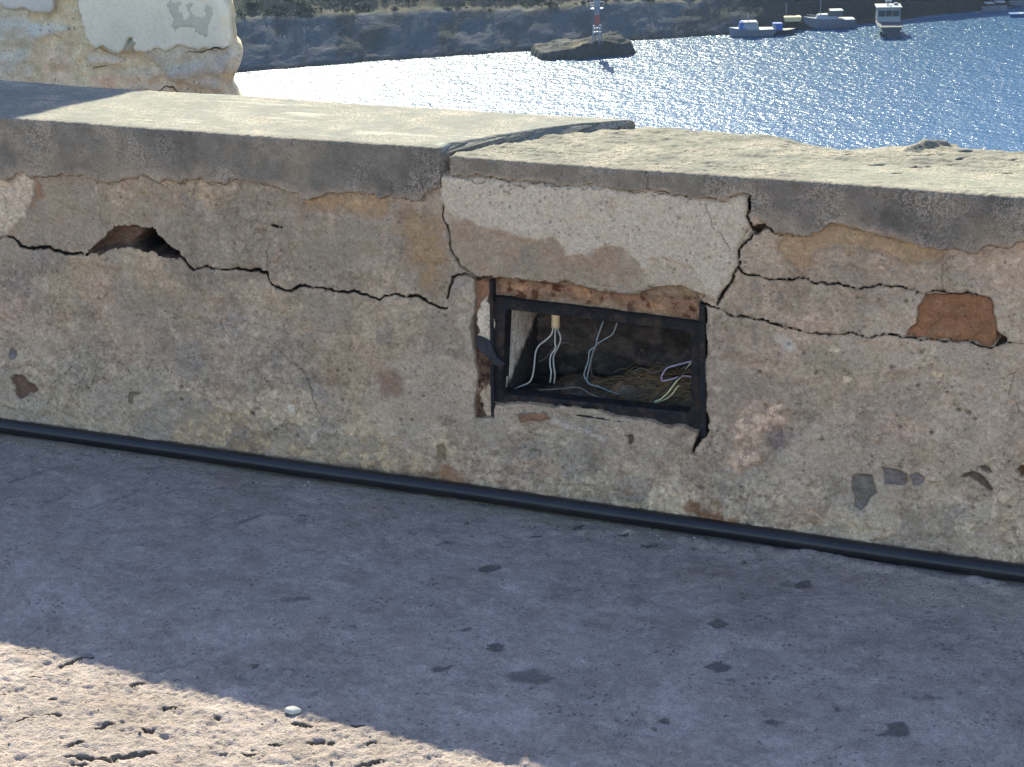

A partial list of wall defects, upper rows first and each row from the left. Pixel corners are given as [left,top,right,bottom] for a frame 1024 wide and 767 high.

peeling [167,0,213,37]
crack [1,235,83,255]
spalling [83,225,183,260]
crack [19,171,1024,349]
rust [476,277,700,320]
peeling [477,296,495,340]
spalling [907,293,1007,346]
spalling [12,375,39,398]
peeling [480,383,497,416]
spalling [518,412,550,423]
crack [683,433,724,456]
spalling [852,467,924,510]